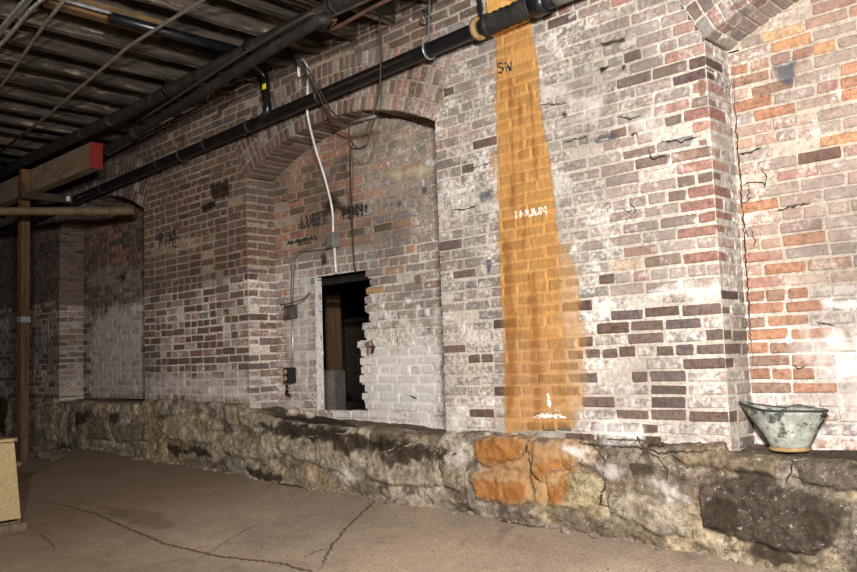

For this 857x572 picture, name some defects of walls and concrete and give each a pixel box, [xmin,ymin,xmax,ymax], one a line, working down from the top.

crack [734,81,767,374]
spalling [361,340,376,355]
crack [519,434,536,501]
crack [579,433,715,510]
crack [47,501,375,572]